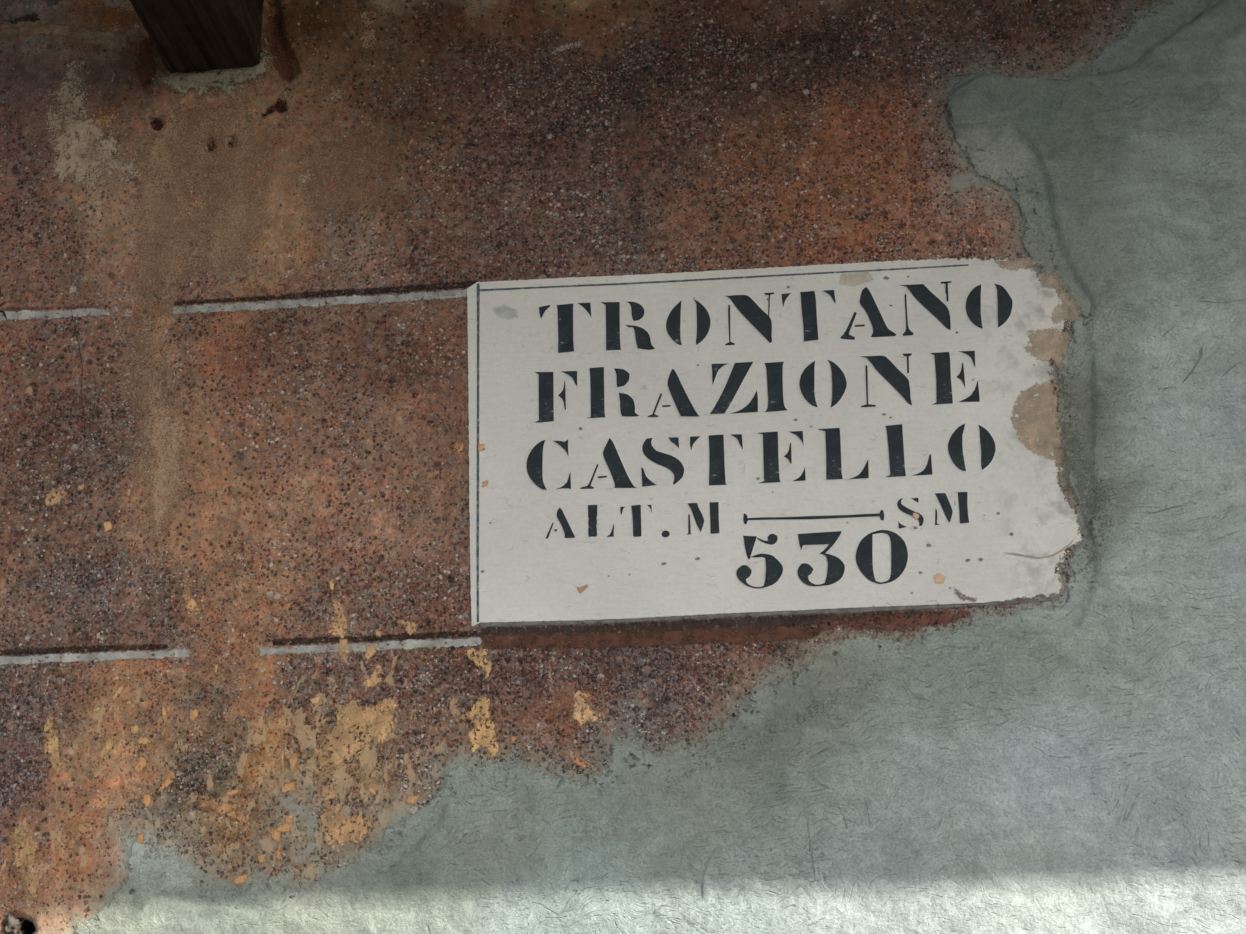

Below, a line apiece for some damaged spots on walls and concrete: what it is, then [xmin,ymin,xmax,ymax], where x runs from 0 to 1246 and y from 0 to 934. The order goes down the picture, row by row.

spalling [994,255,1083,371]
spalling [1010,382,1063,461]
peeling [328,580,349,662]
peeling [397,620,417,635]
peeling [363,631,383,687]
peeling [465,648,492,679]
peeling [313,698,398,772]
peeling [462,696,517,756]
peeling [572,691,602,725]
peeling [143,770,175,807]
peeling [196,789,249,823]
peeling [318,787,372,846]